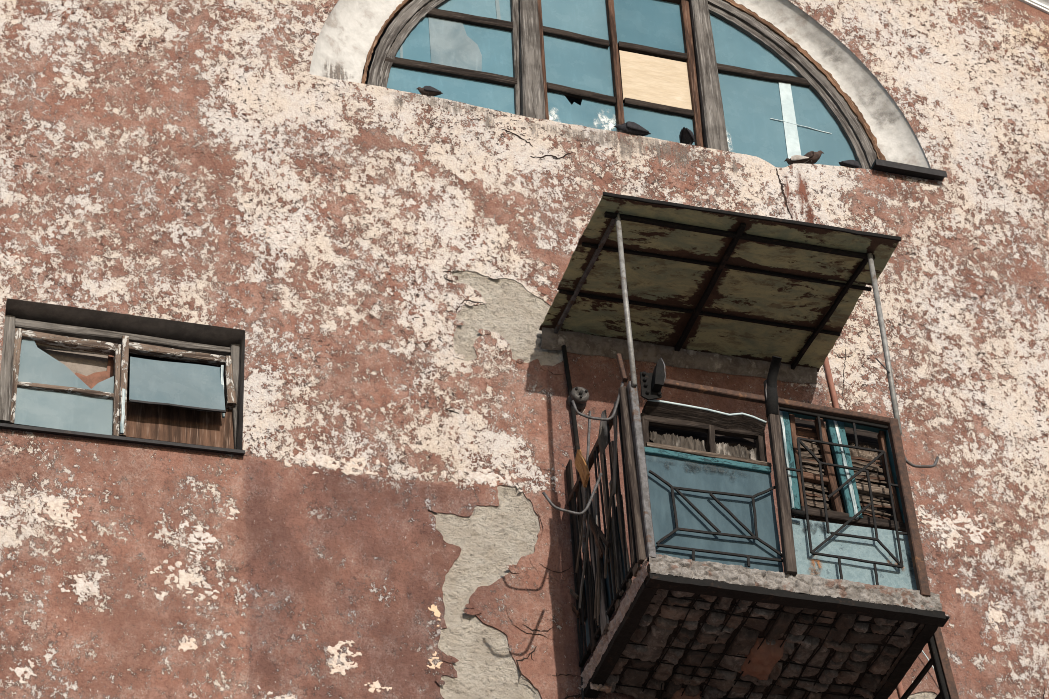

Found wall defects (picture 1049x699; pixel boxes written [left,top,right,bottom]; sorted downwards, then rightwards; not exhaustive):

crack [776,168,792,218]
flaking render [444,270,563,371]
peeling [279,445,387,476]
peeling [0,488,92,552]
peeling [58,574,99,598]
peeling [150,520,223,609]
flaking render [425,456,542,699]
peeling [6,659,37,684]
peeling [178,635,198,652]
peeling [326,640,362,676]
peeling [364,680,392,693]
spalling [580,554,942,699]